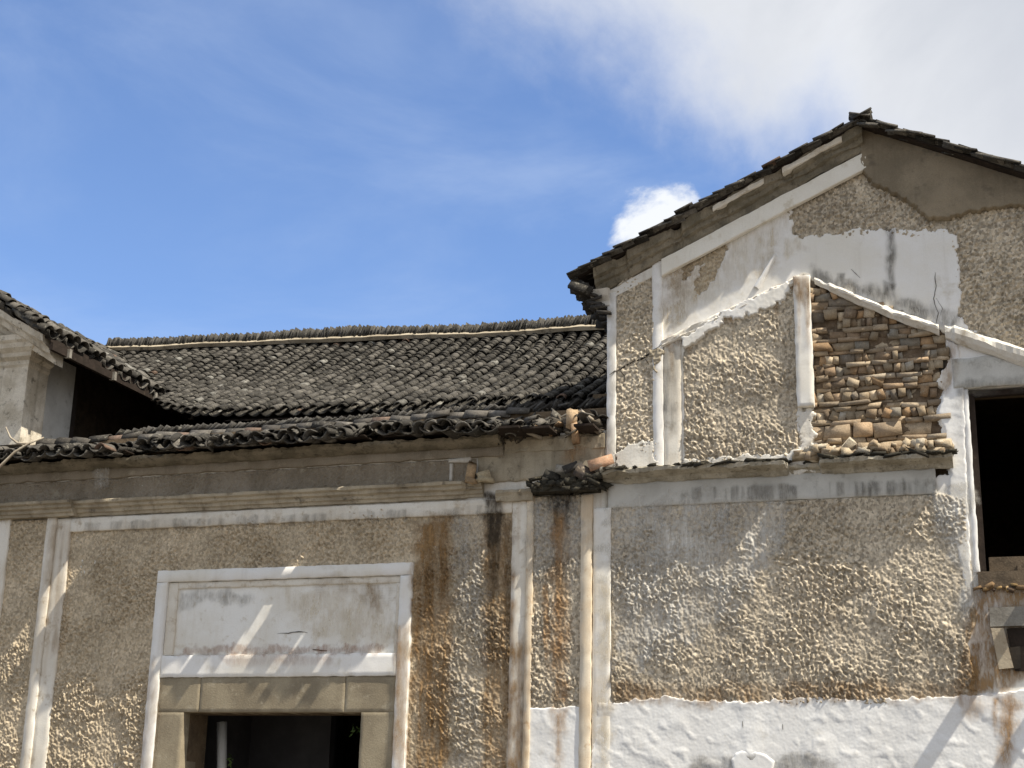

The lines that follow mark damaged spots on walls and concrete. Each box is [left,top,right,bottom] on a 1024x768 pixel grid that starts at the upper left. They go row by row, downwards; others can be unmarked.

peeling [542,439,660,483]
flaking render [680,245,728,297]
flaking render [681,281,955,475]
flaking render [787,130,1024,348]
leakage [412,518,452,768]
leakage [466,492,523,768]